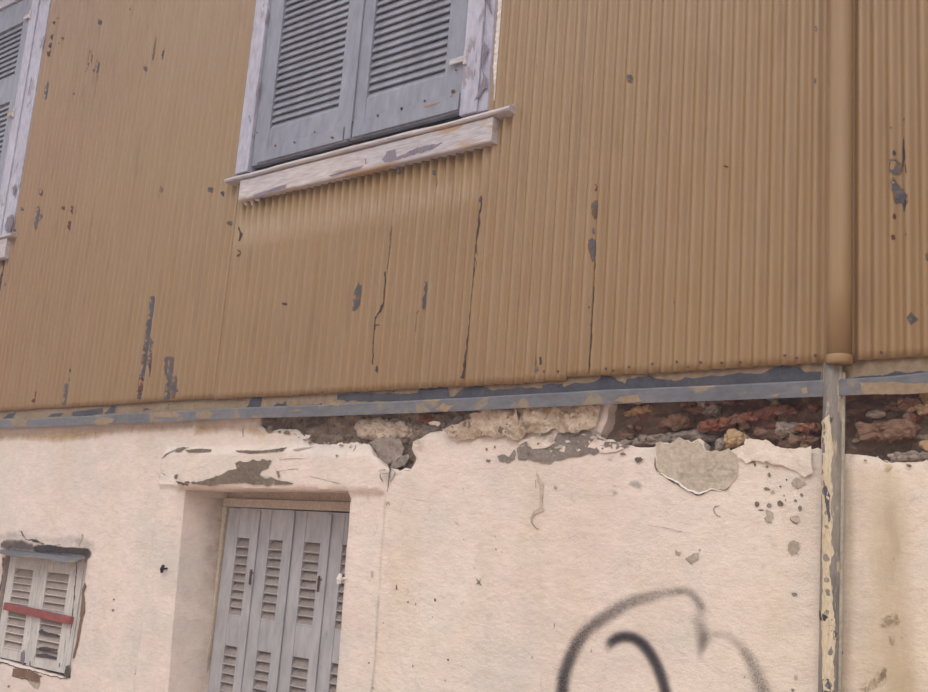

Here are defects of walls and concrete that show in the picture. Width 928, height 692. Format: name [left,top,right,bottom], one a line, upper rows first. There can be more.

peeling [889,139,908,213]
peeling [136,296,181,418]
peeling [48,369,116,426]
spalling [845,392,928,468]
spalling [159,365,844,692]
flaking render [7,647,60,689]